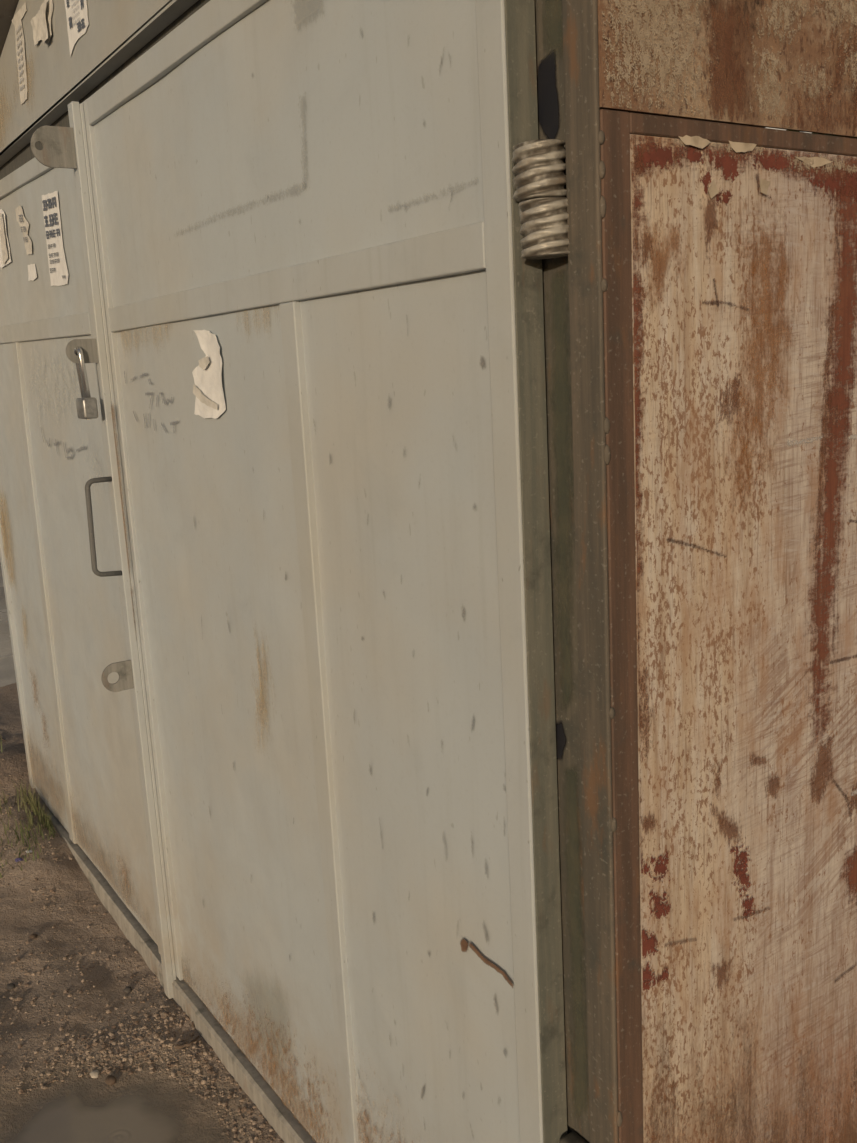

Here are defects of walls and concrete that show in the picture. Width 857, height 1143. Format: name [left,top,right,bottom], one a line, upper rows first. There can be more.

rust [705,3,749,119]
rust [782,10,857,135]
peeling [674,135,764,158]
peeling [783,152,857,176]
rust [632,135,857,803]
rust [840,848,857,904]